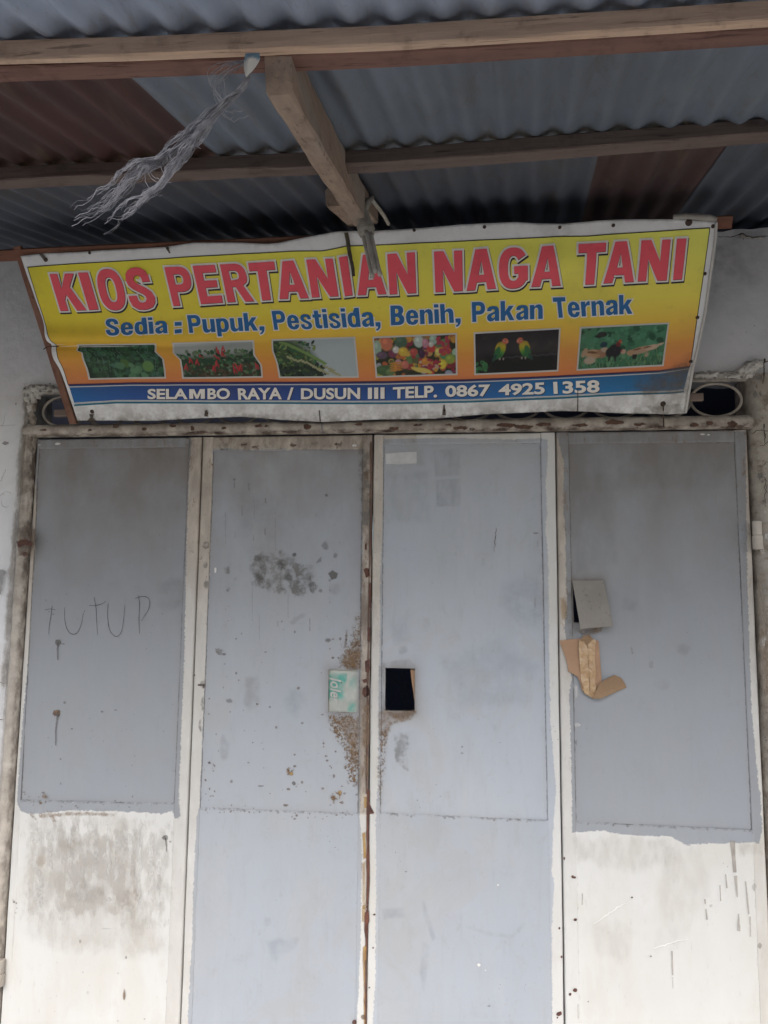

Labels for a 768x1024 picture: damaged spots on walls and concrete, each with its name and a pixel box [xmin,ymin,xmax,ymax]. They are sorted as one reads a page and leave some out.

corrosion [494,422,554,431]
corrosion [690,421,744,429]
corrosion [326,423,416,1024]
peeling [720,841,762,948]